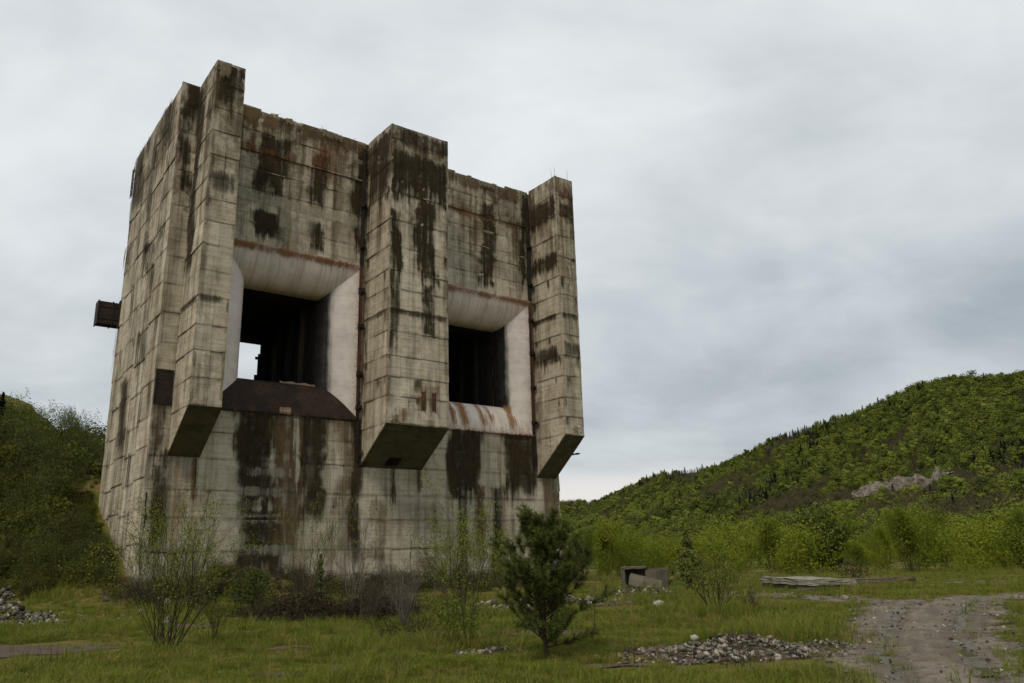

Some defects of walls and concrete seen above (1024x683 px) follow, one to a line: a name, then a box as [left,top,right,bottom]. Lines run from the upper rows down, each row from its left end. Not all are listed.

corrosion [234,238,352,269]
damp [107,66,580,547]
corrosion [449,402,517,428]
damp [186,404,384,578]
damp [446,422,560,572]